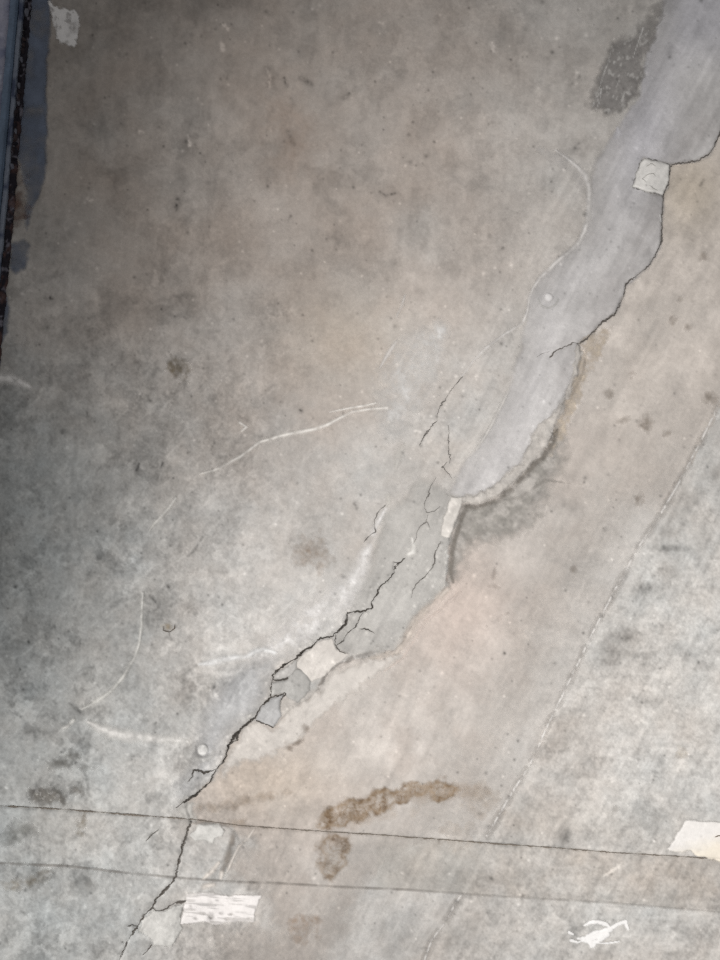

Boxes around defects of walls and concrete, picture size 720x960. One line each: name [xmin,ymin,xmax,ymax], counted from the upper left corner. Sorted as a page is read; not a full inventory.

crack [540,132,720,358]
crack [120,378,461,957]
spalling [180,137,720,960]